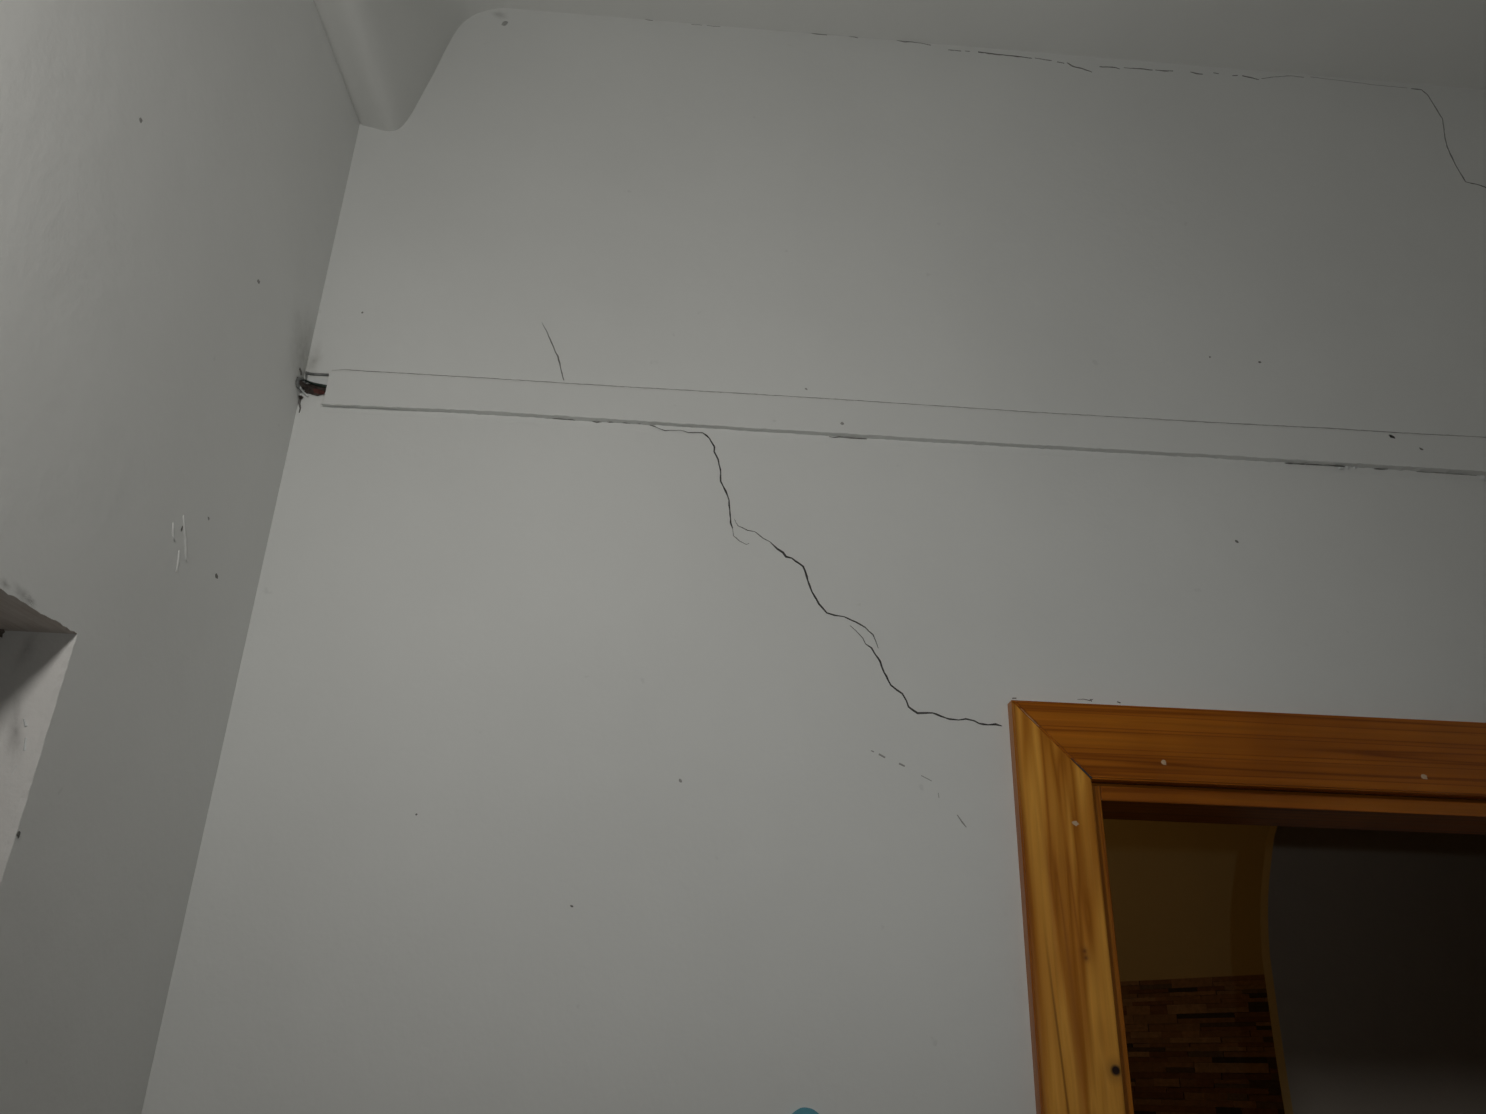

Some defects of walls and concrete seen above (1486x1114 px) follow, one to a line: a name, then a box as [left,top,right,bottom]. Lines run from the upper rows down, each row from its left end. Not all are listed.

crack [896,40,1486,188]
crack [340,325,1486,438]
crack [553,418,1002,726]